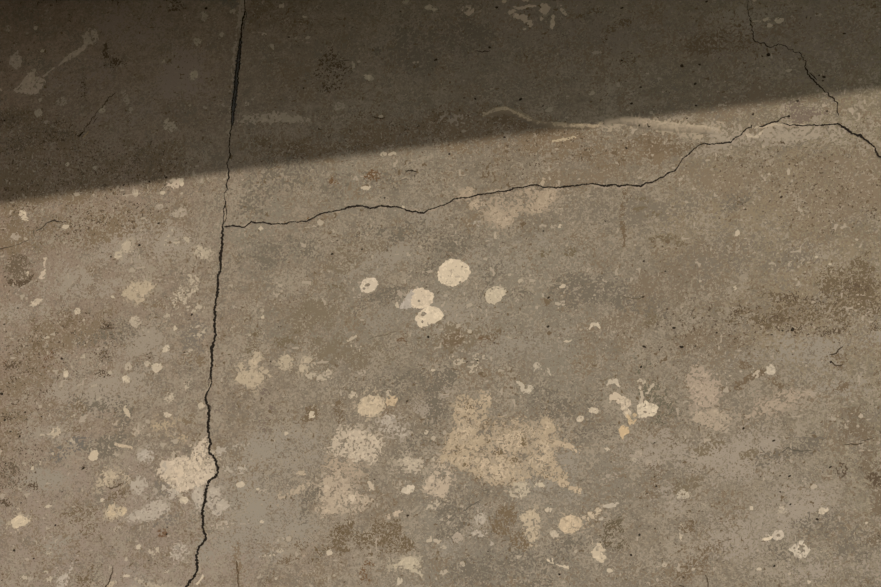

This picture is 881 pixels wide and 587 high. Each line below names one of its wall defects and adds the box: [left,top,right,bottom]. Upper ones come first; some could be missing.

crack [185,1,881,587]